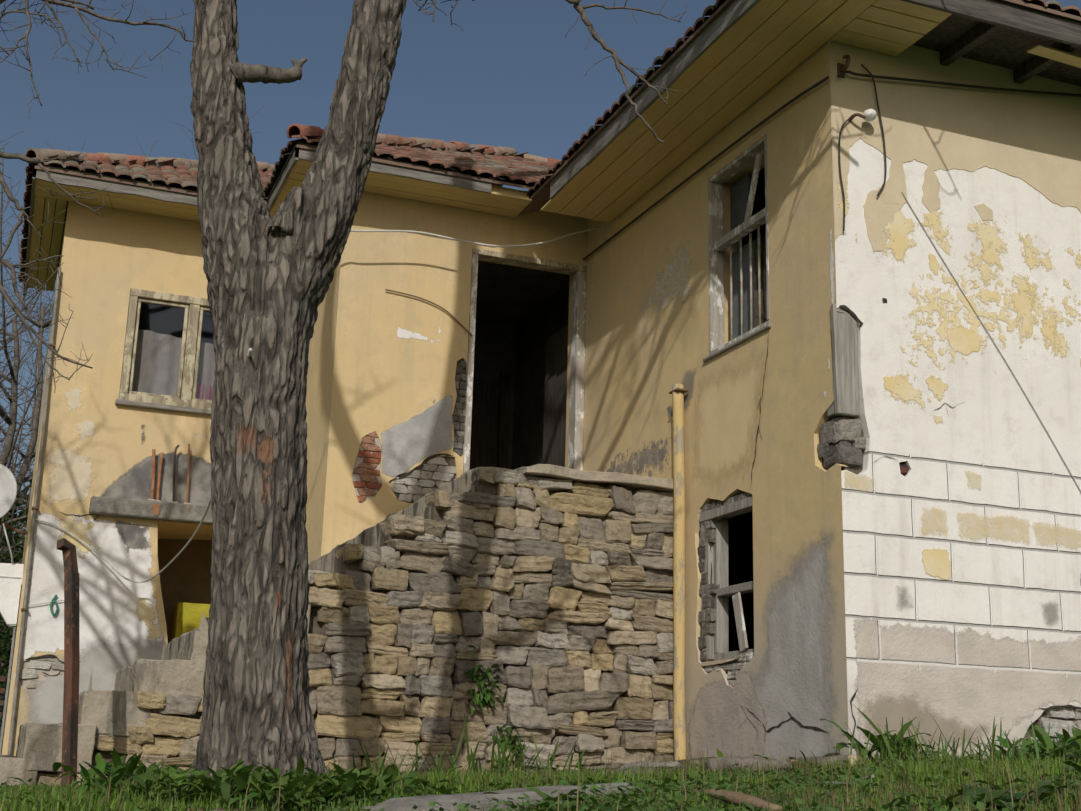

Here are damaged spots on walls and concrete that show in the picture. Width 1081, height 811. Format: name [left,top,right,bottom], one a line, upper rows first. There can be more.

peeling [817,39,1081,491]
peeling [0,420,166,755]
spalling [352,359,468,504]
leakage [607,438,670,477]
peeling [688,490,837,761]
crack [740,690,863,756]
peeling [922,548,952,580]
peeling [854,618,1081,760]
peeling [922,508,1081,548]